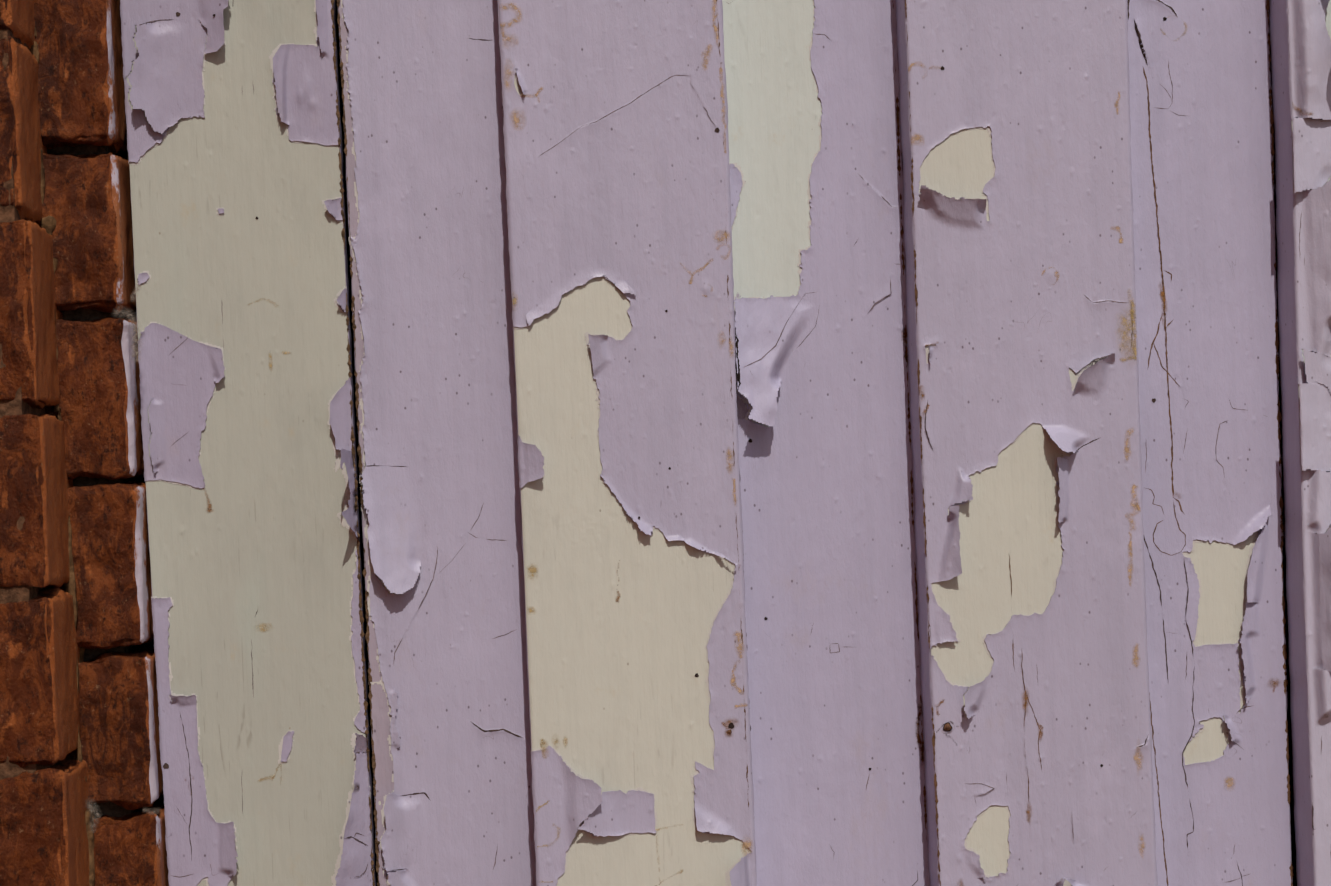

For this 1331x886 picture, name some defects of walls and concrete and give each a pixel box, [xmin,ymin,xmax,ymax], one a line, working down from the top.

peeling [125,0,433,886]
peeling [514,259,753,886]
peeling [722,0,822,426]
peeling [918,128,994,236]
peeling [959,805,1010,879]
peeling [930,422,1096,719]
crack [1073,59,1267,886]
peeling [1183,715,1246,765]
peeling [1189,503,1274,703]
peeling [1287,0,1331,727]